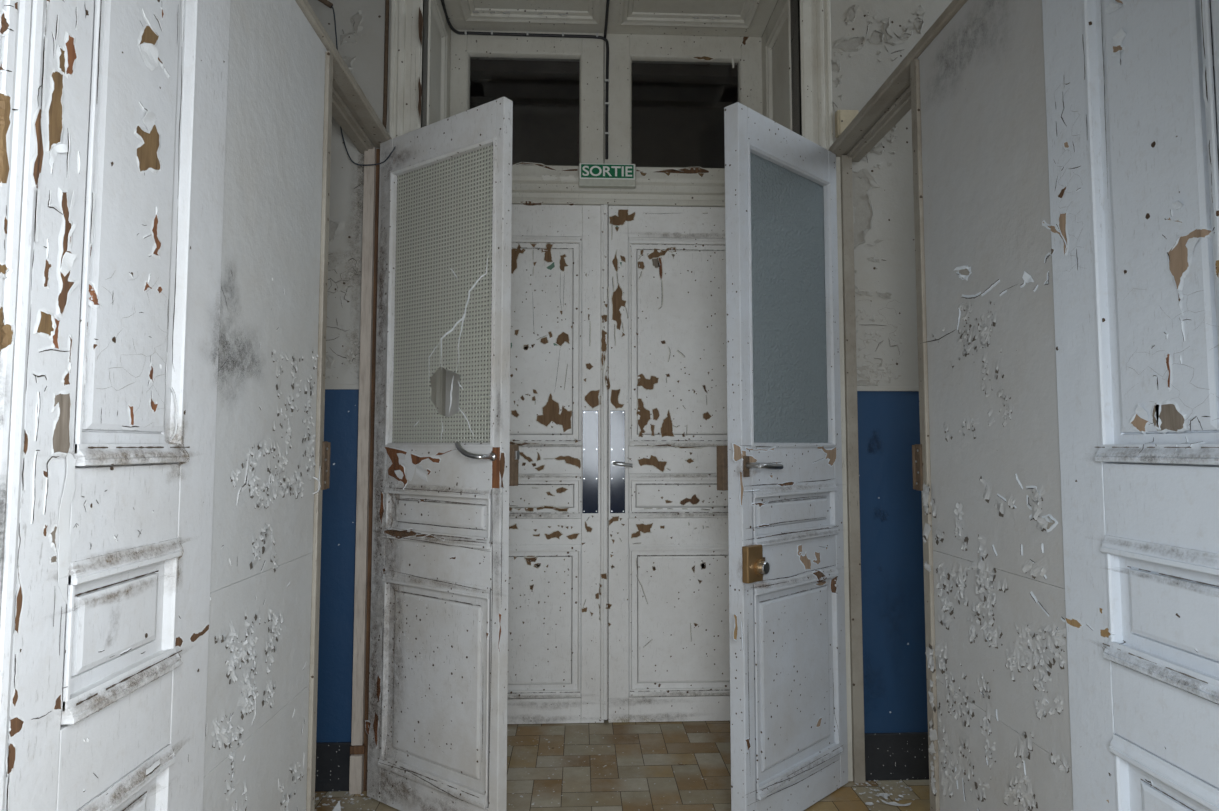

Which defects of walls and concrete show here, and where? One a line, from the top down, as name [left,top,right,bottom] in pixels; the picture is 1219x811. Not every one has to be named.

crack [1200,0,1208,108]
peeling [0,90,18,187]
peeling [134,102,162,175]
crack [1207,140,1215,212]
peeling [0,205,15,354]
peeling [30,0,113,605]
peeling [379,209,712,656]
peeling [1128,209,1219,434]
crack [1128,290,1219,455]
peeling [13,524,24,635]
peeling [922,476,1126,811]
peeling [5,653,68,811]